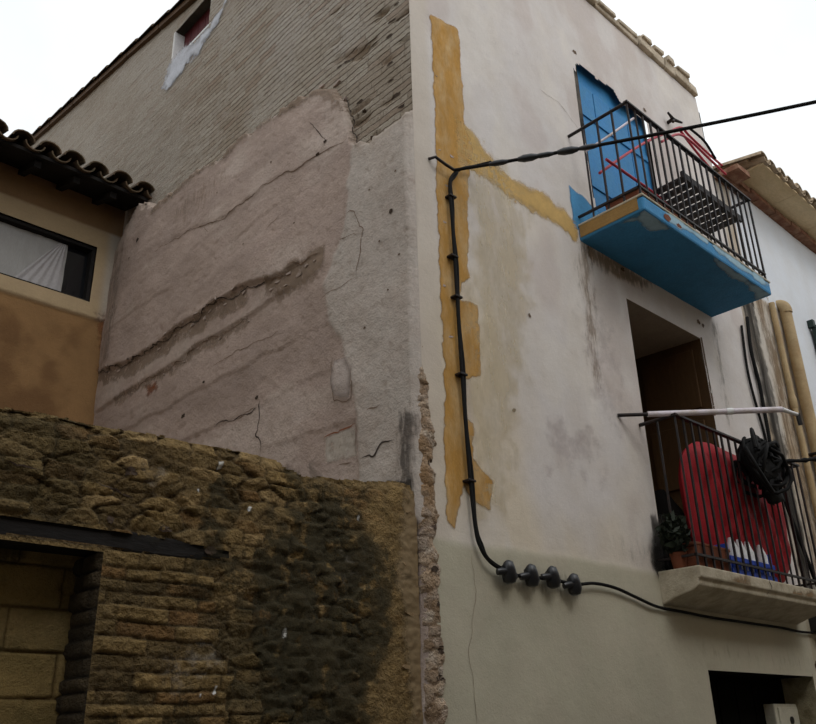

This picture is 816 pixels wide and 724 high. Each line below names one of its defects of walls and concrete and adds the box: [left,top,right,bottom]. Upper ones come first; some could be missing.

peeling [222,79,366,158]
crack [156,123,347,251]
crack [319,210,363,301]
peeling [397,15,578,724]
crack [216,404,261,453]
crack [337,440,392,466]